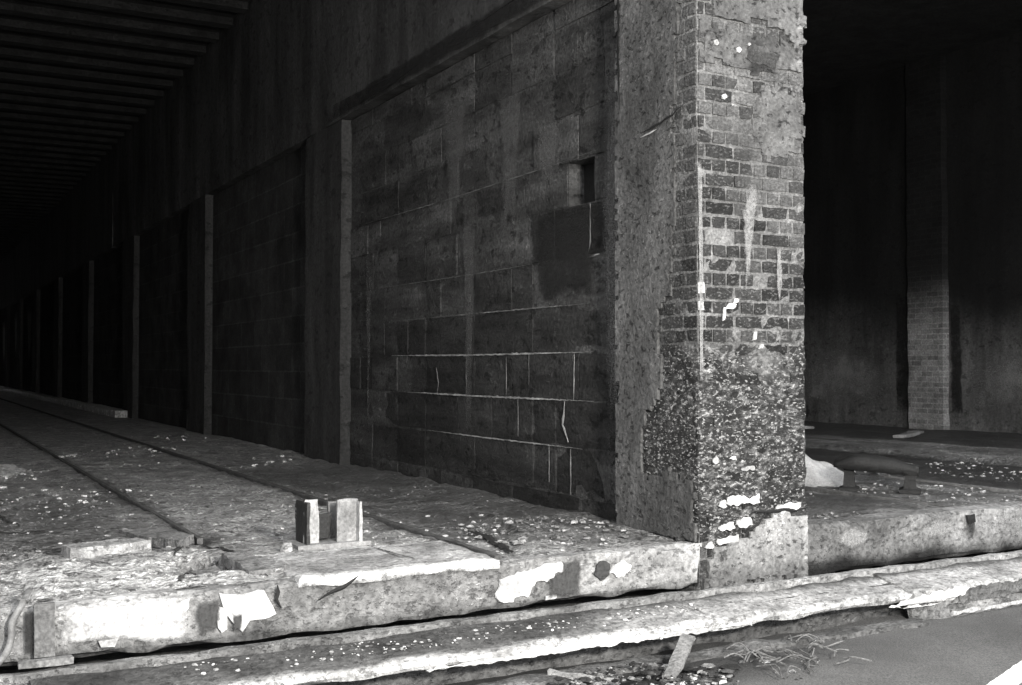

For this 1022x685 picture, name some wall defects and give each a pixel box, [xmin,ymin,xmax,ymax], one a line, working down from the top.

spalling [736,43,780,69]
spalling [712,456,755,471]
spalling [718,493,760,508]
spalling [775,502,801,510]
spalling [705,517,753,549]
peeling [495,561,564,603]
spalling [594,560,631,581]
peeling [63,598,190,648]
peeling [217,590,276,633]